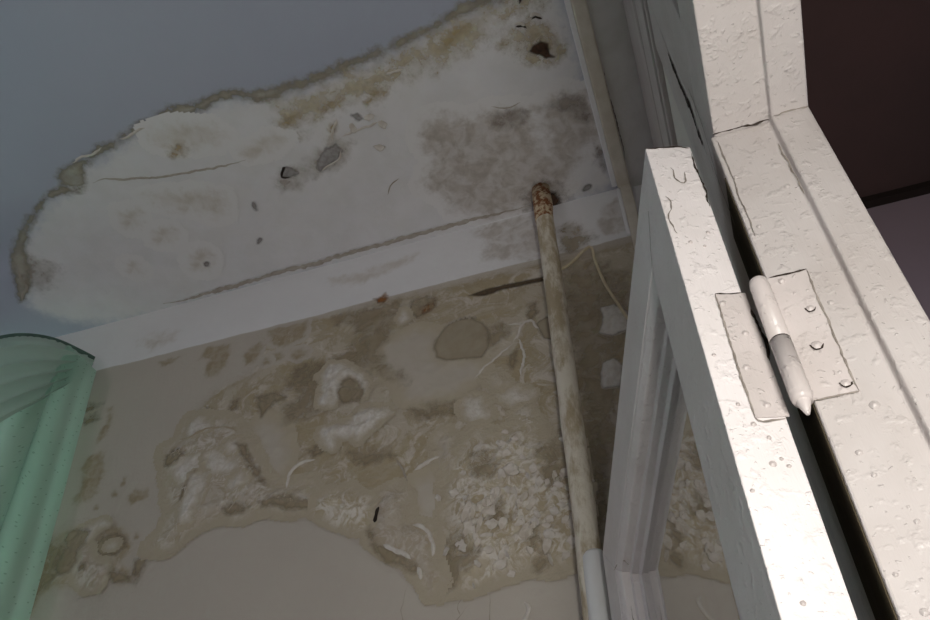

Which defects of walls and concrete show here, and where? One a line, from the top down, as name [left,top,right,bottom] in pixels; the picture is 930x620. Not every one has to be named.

spalling [526,38,554,63]
flaking render [281,167,299,179]
flaking render [317,144,342,171]
damp [0,0,635,620]
flaking render [599,304,627,337]
flaking render [600,358,622,390]
flaking render [432,414,578,607]